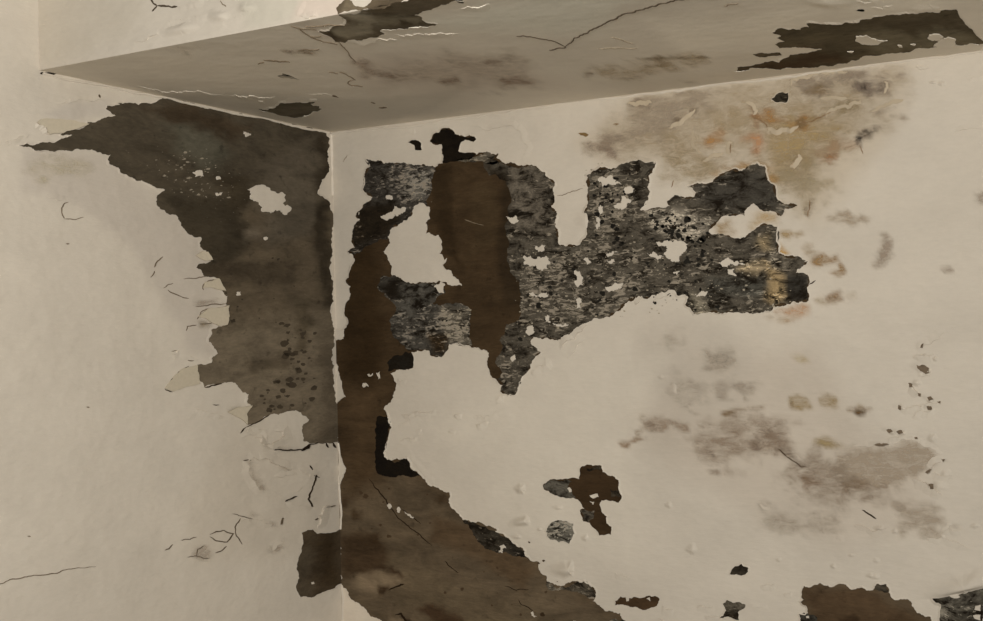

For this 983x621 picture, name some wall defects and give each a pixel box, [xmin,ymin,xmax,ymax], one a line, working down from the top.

peeling [318,0,491,46]
crack [517,0,677,51]
crack [258,24,387,109]
peeling [730,8,983,104]
leakage [758,72,882,186]
peeling [17,86,811,621]
crack [275,442,336,525]
leakage [801,444,933,499]
crack [166,514,252,559]
crack [0,566,96,584]
peeling [797,582,983,621]